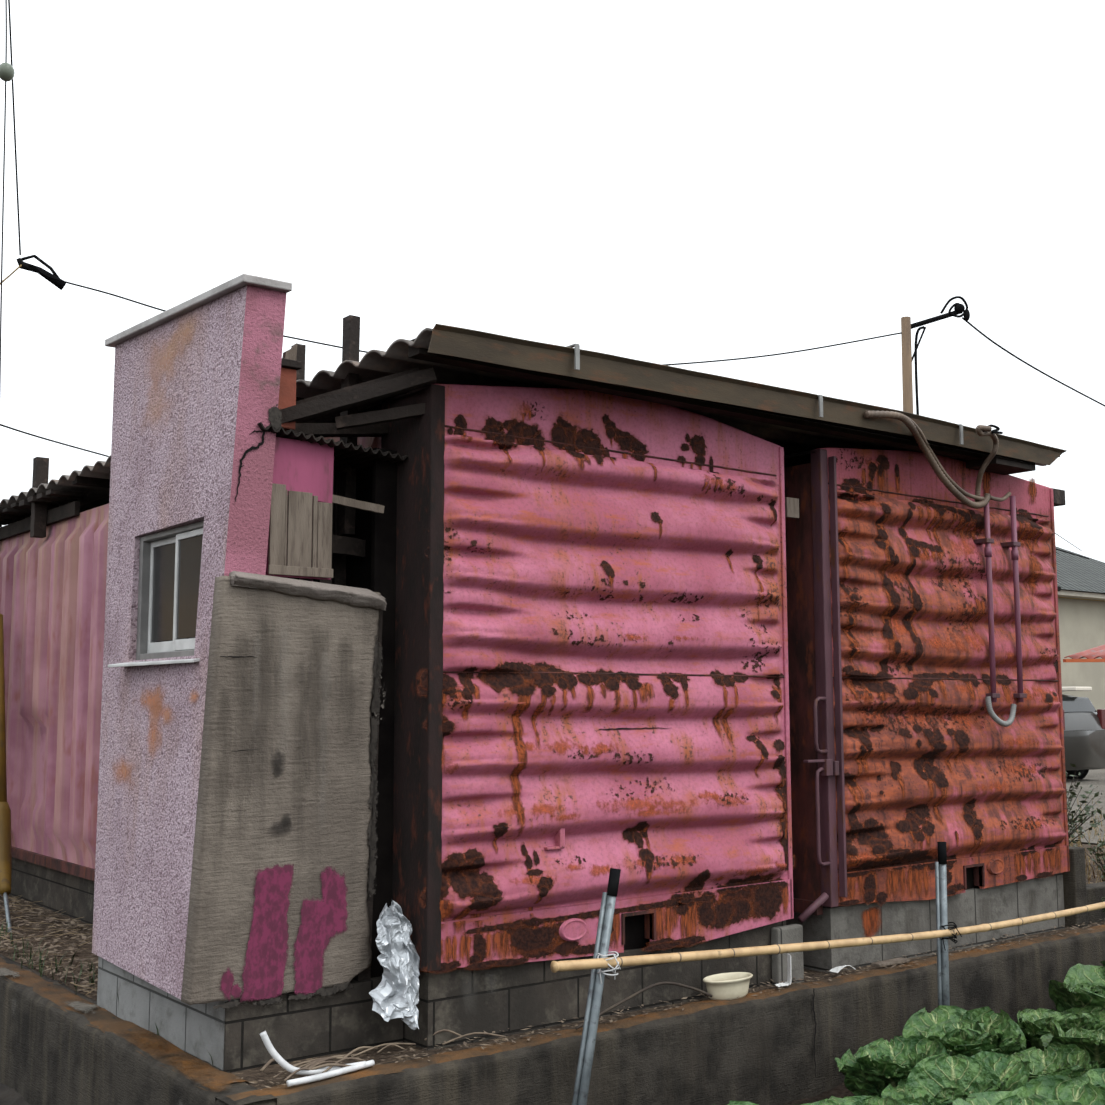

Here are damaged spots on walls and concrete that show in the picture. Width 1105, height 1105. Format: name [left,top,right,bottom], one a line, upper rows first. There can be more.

crack [235,427,275,502]
rust [447,402,657,481]
rust [677,434,743,493]
rust [710,669,748,741]
rust [766,673,784,721]
rust [836,449,1061,937]
damp [274,753,284,775]
damp [272,815,290,834]
rust [425,661,690,973]
rust [599,735,795,951]